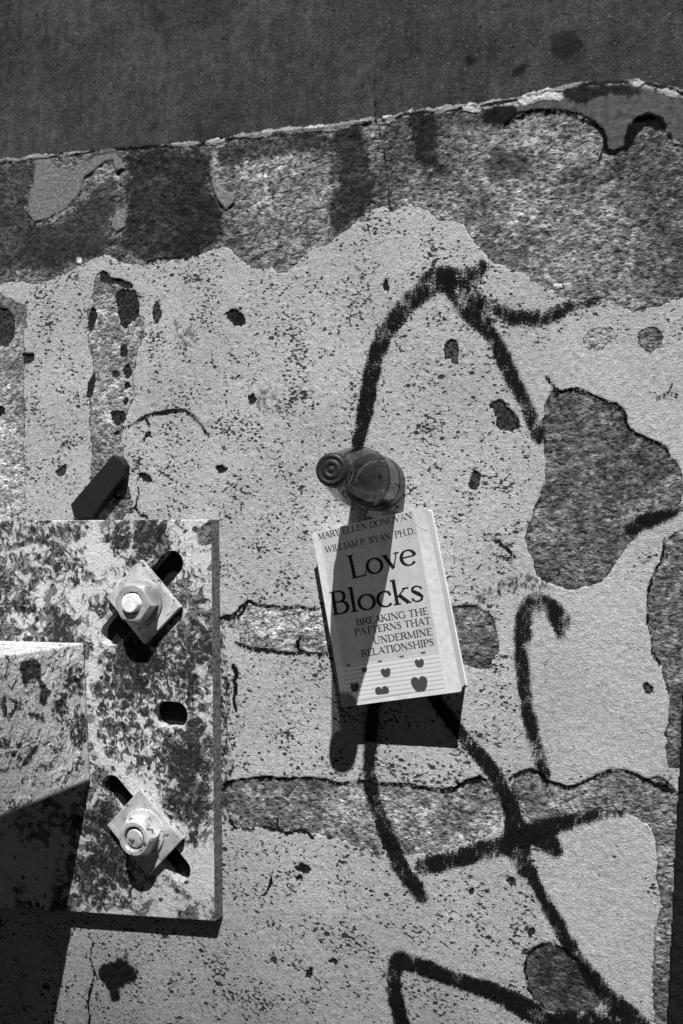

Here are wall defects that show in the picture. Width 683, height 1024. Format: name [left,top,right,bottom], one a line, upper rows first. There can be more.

spalling [0,78,683,520]
crack [113,408,209,436]
spalling [525,388,683,591]
crack [220,599,315,620]
spalling [220,529,683,1024]